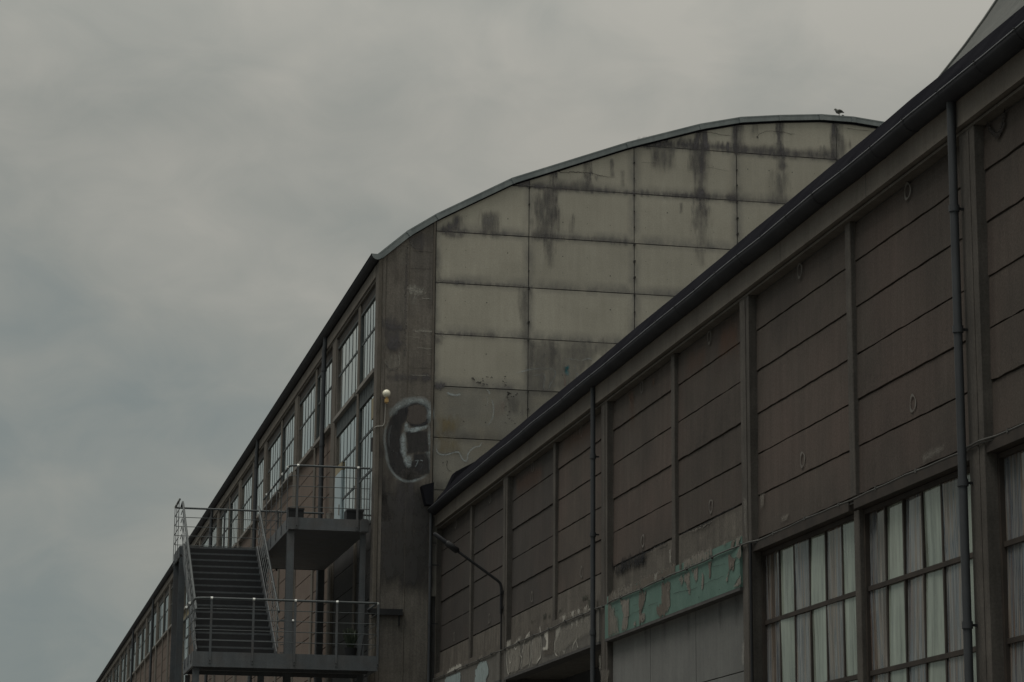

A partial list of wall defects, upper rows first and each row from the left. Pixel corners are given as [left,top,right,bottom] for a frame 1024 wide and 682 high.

damp [647,123,844,210]
peeling [608,548,712,631]
peeling [507,606,590,674]